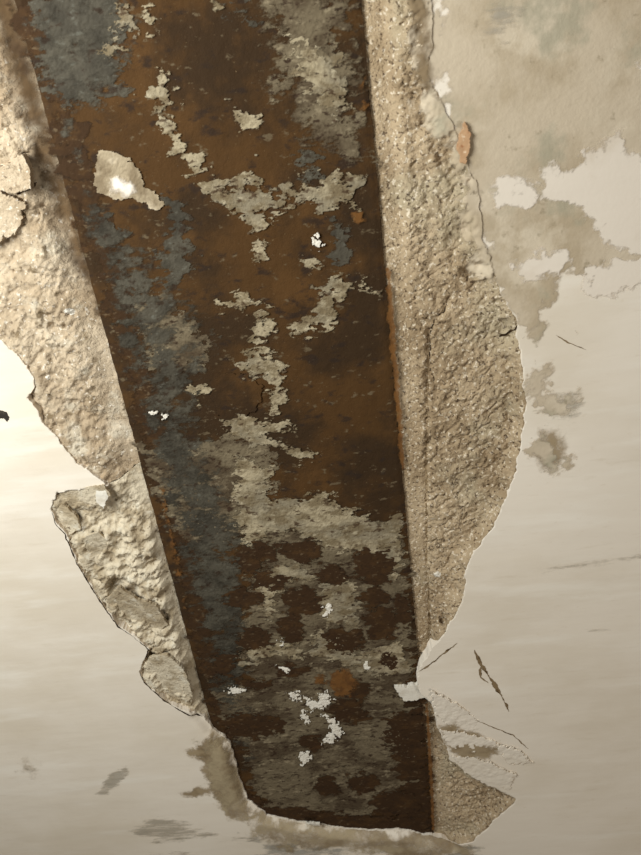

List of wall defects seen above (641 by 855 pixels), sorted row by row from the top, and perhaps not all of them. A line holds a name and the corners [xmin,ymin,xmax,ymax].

peeling [145,67,212,178]
peeling [197,0,368,234]
peeling [93,150,196,288]
peeling [286,272,383,340]
peeling [234,309,290,416]
corrosion [0,0,436,833]
damp [541,432,564,468]
damp [98,768,127,794]
damp [135,820,212,843]
spalling [206,690,533,855]
damp [441,725,498,759]
crack [417,643,527,748]